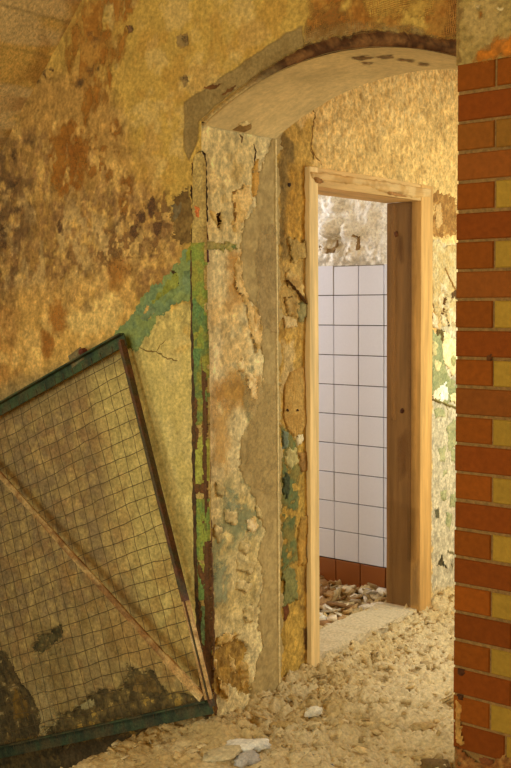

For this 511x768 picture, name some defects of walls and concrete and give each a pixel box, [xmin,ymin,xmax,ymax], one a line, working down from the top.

crack [310,110,322,165]
damp [97,193,171,265]
peeling [232,159,259,232]
peeling [114,186,194,352]
peeling [282,236,308,328]
crack [140,340,177,361]
peeling [432,190,458,477]
corrosion [190,250,218,717]
peeling [212,505,263,544]
peeling [280,426,308,607]
peeling [435,489,456,529]
spalling [214,631,250,701]